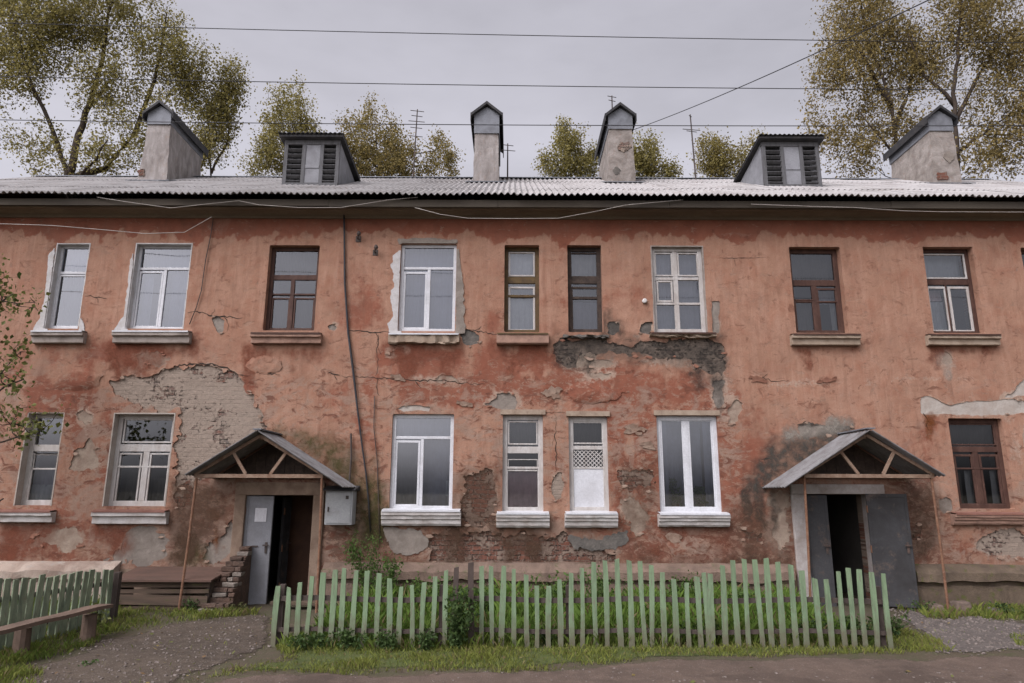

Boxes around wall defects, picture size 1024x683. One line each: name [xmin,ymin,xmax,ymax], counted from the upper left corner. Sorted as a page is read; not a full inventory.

crack [188,309,240,331]
flaking render [69,438,99,472]
flaking render [110,350,267,509]
crack [329,330,483,395]
flaking render [426,468,616,563]
flaking render [617,467,656,536]
flaking render [553,301,742,426]
water stain [742,417,853,540]
flaking render [976,528,1024,560]
flaking render [1003,380,1024,415]